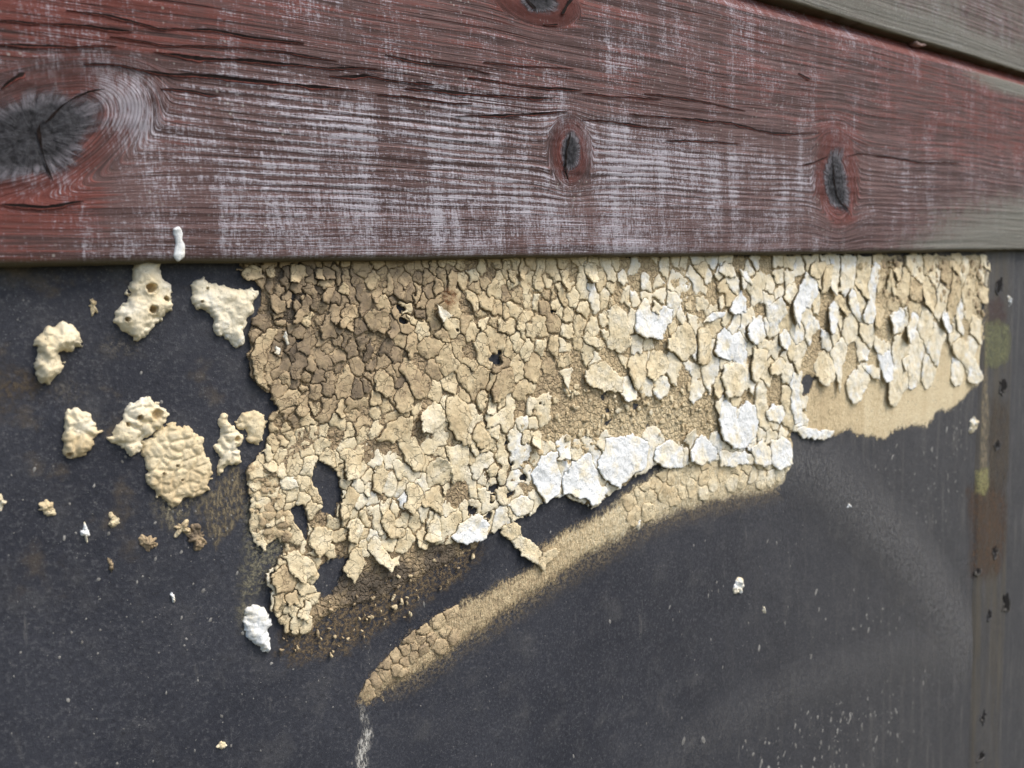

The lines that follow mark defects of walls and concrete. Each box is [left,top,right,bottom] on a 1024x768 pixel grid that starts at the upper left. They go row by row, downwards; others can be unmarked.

peeling [236,252,991,705]